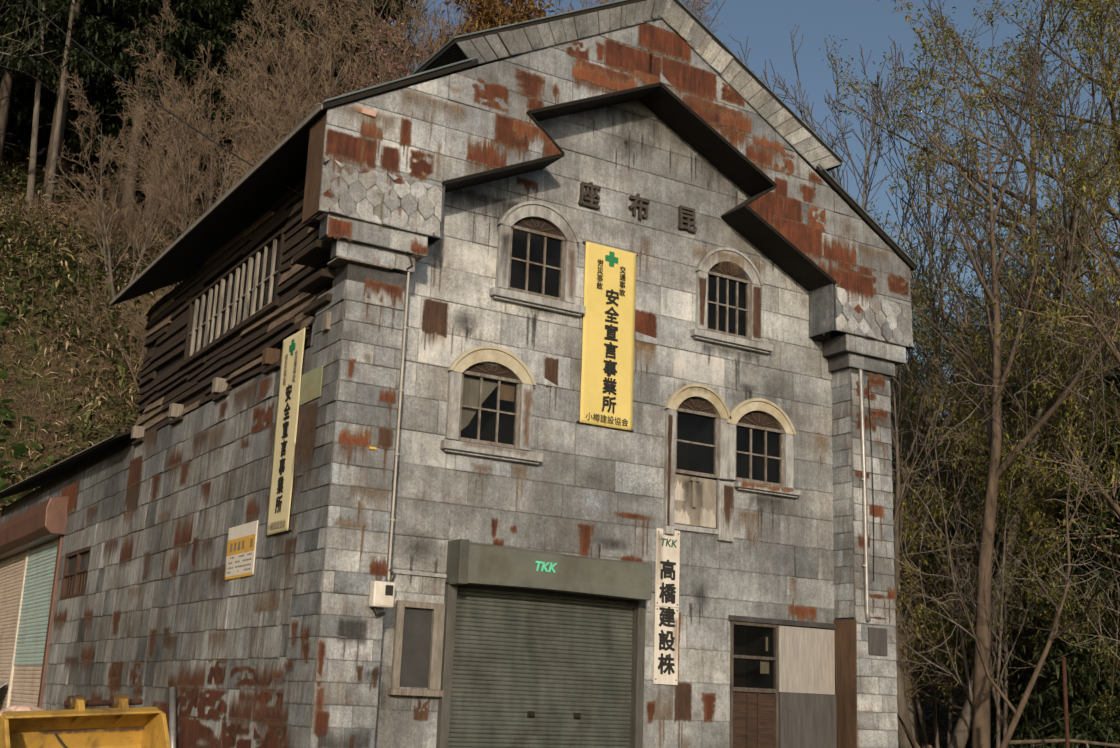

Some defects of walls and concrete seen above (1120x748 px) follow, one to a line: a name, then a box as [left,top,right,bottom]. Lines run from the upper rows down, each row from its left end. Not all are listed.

rust [467,68,561,170]
rust [324,117,412,211]
rust [572,23,874,313]
rust [422,299,448,365]
rust [635,310,657,356]
rust [544,357,559,404]
rust [339,388,396,469]
rust [103,429,207,579]
rust [491,519,516,546]
rust [578,523,594,557]
rust [724,482,793,527]
rust [675,613,716,727]